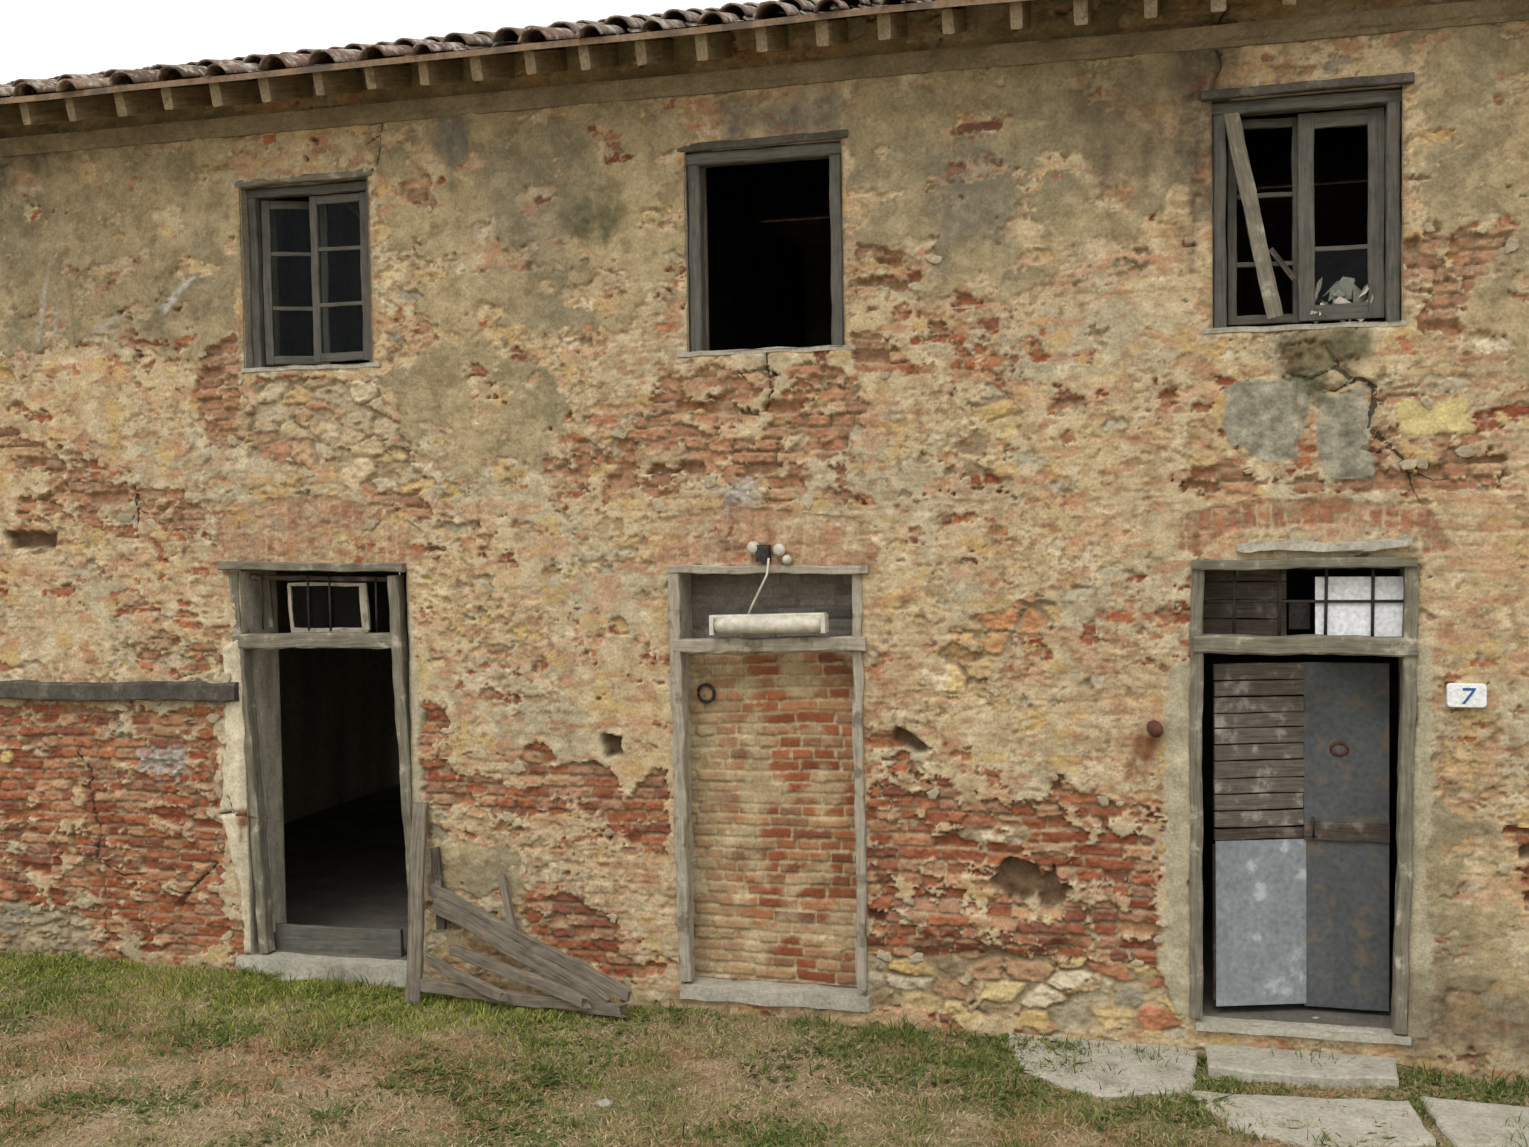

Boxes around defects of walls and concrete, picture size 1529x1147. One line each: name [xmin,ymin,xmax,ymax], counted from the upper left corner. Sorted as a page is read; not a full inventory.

spalling [537,330,907,512]
spalling [1172,377,1515,508]
spalling [129,632,231,683]
spalling [0,700,235,965]
spalling [418,696,674,860]
spalling [516,891,667,980]
spalling [863,724,1185,1036]
spalling [1492,821,1529,920]